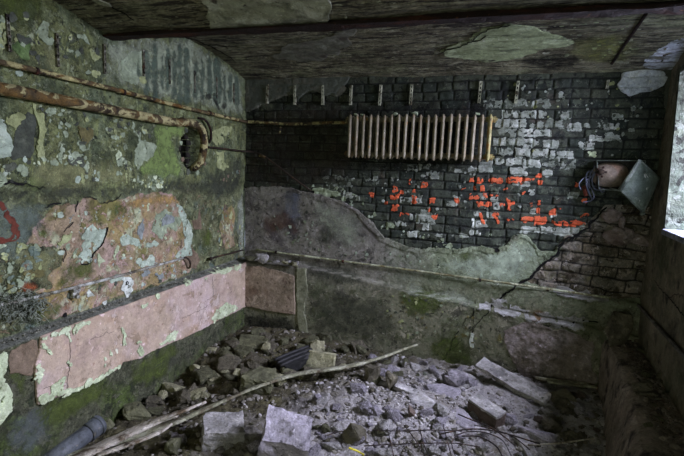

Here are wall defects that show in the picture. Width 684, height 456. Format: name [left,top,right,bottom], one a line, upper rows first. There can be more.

peeling [0,11,55,65]
peeling [63,34,101,78]
peeling [121,50,144,85]
peeling [440,20,641,62]
flaking render [0,101,100,187]
flaking render [212,39,666,299]
peeling [0,117,242,323]
crack [443,207,607,360]
peeling [8,321,91,384]
peeling [38,350,121,405]
peeling [159,330,178,345]